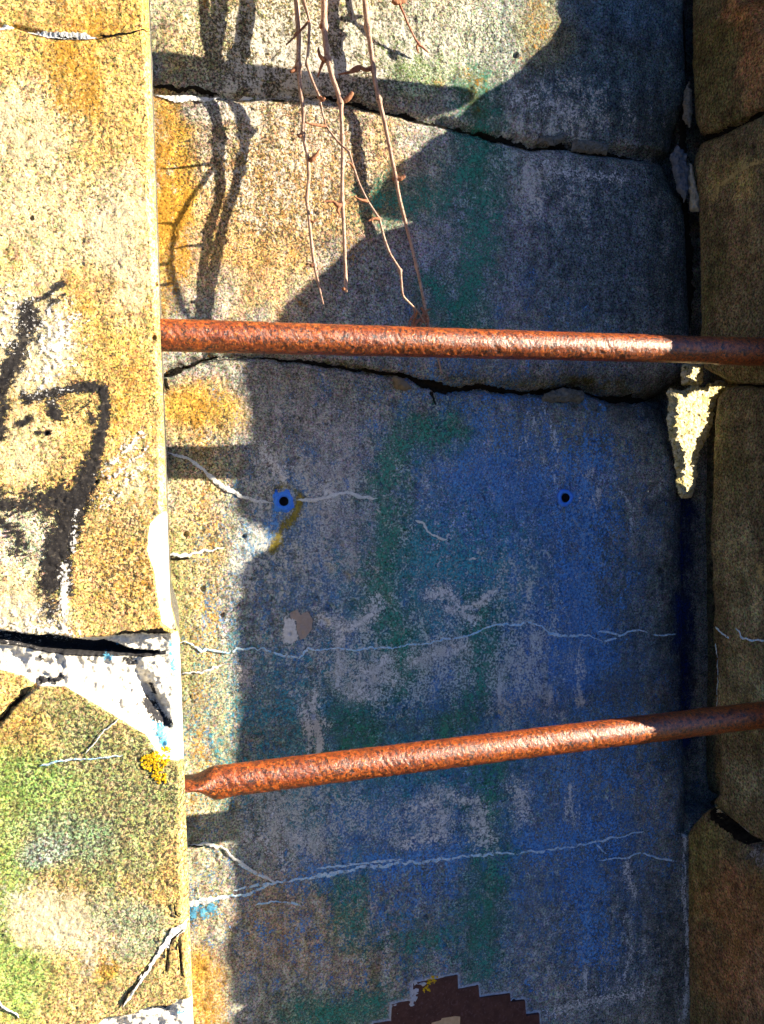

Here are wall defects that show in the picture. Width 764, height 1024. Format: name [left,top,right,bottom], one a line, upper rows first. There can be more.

crack [153,84,643,161]
crack [164,356,656,405]
peeling [680,363,704,385]
crack [167,452,273,504]
crack [298,491,378,502]
spalling [0,511,184,760]
crack [0,621,675,675]
crack [715,627,764,642]
crack [0,687,31,722]
crack [122,829,674,1006]